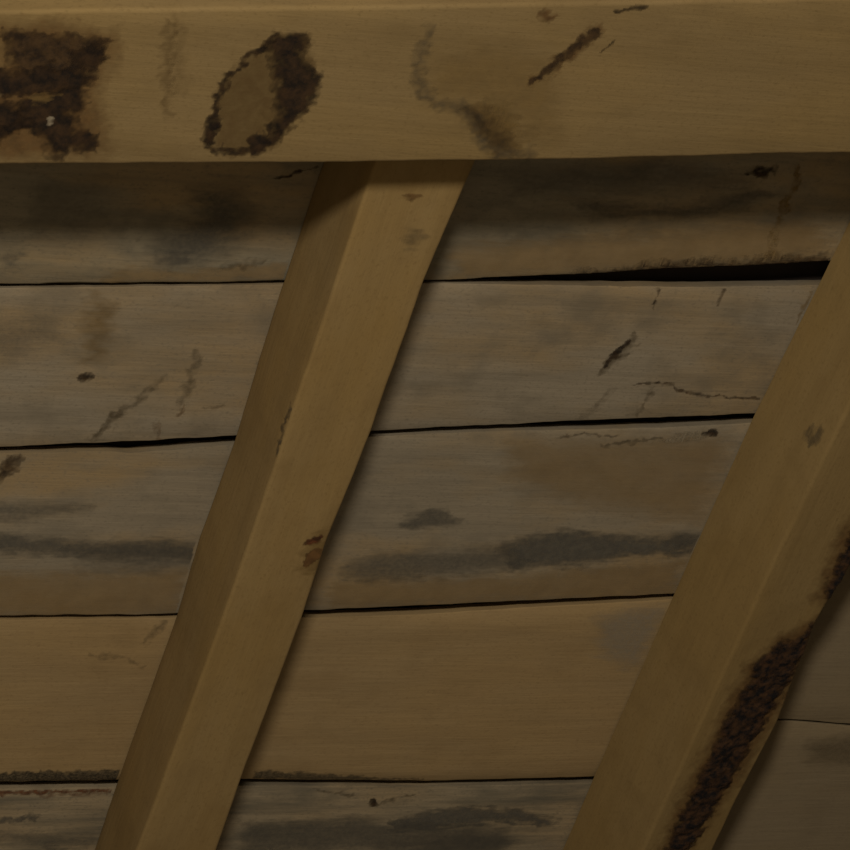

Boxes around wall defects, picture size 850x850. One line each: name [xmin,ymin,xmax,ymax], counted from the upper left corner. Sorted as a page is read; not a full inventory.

crack [601,340,631,371]
damp [504,531,696,569]
damp [337,568,672,603]
damp [389,807,550,830]